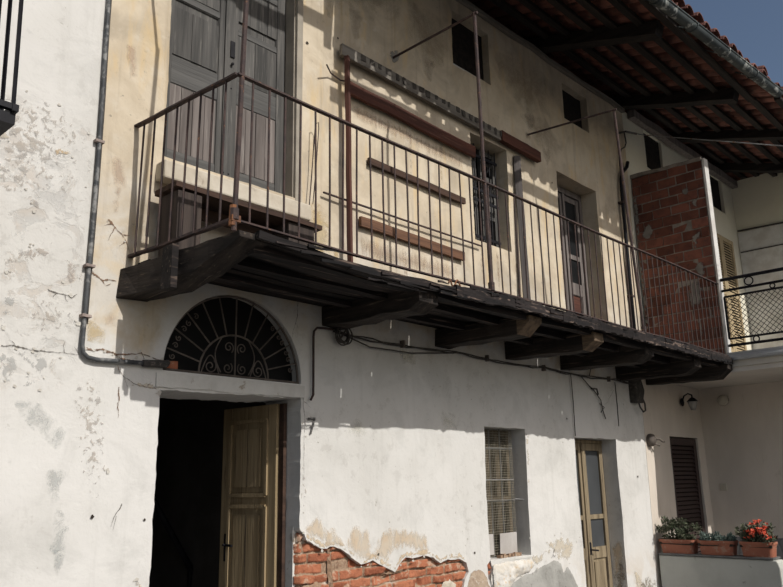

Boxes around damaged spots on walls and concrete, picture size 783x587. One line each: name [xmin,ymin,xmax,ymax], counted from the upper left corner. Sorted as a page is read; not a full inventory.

peeling [0,90,76,191]
peeling [5,243,48,274]
crack [1,341,164,415]
flaking render [293,529,491,587]